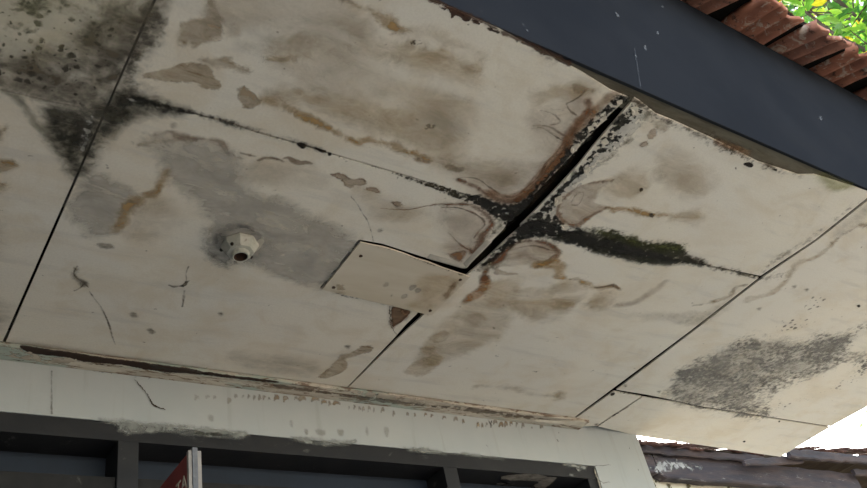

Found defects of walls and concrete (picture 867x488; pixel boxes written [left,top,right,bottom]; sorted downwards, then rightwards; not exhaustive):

leakage [0,0,221,173]
leakage [238,86,258,108]
leakage [294,111,335,132]
leakage [243,153,309,165]
leakage [115,180,164,227]
leakage [392,173,583,271]
leakage [608,207,655,217]
leakage [533,260,619,289]
peeling [9,348,79,364]
mould [670,334,867,418]
peeling [273,385,586,433]